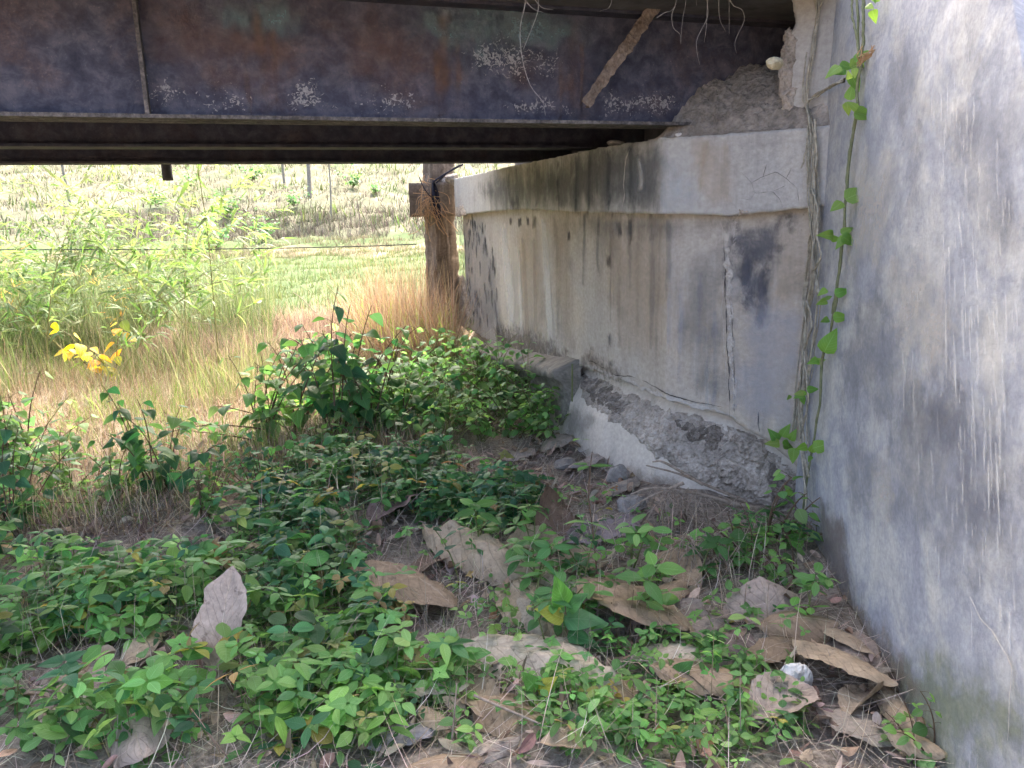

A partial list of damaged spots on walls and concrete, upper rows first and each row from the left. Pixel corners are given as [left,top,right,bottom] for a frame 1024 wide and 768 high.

spalling [778,27,798,111]
damp [488,149,656,226]
damp [730,224,780,323]
crack [721,228,760,432]
spalling [579,361,797,513]